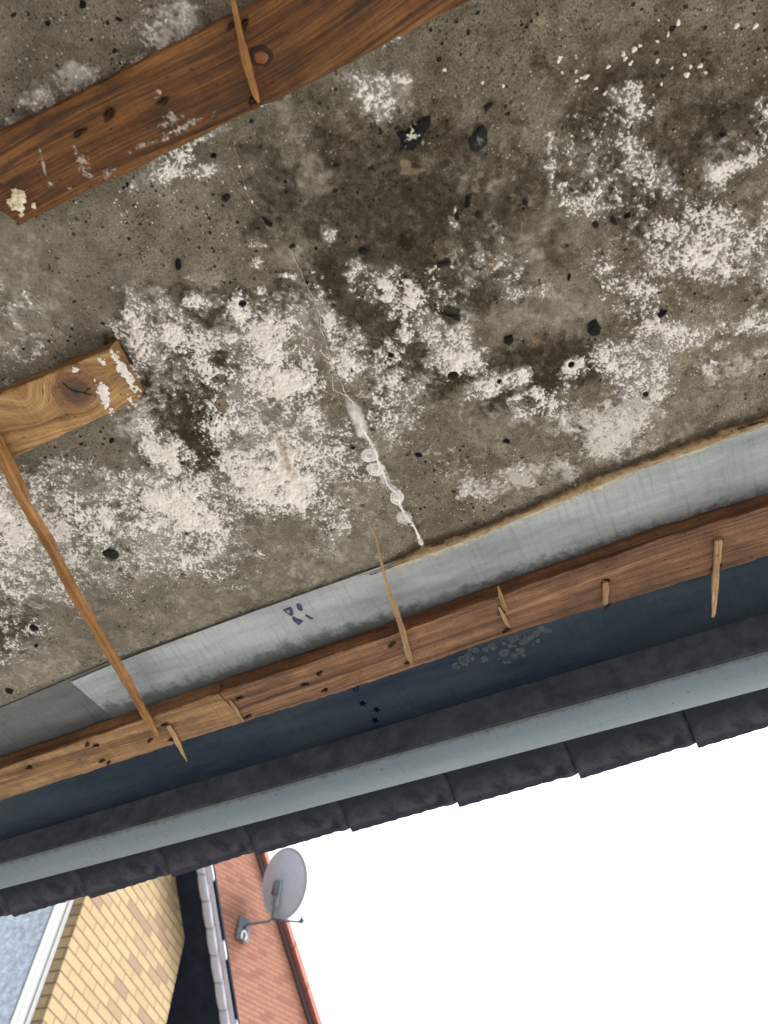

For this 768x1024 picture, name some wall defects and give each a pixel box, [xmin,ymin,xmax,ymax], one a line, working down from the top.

water stain [140,1,197,50]
water stain [0,44,768,693]
crack [292,252,501,575]